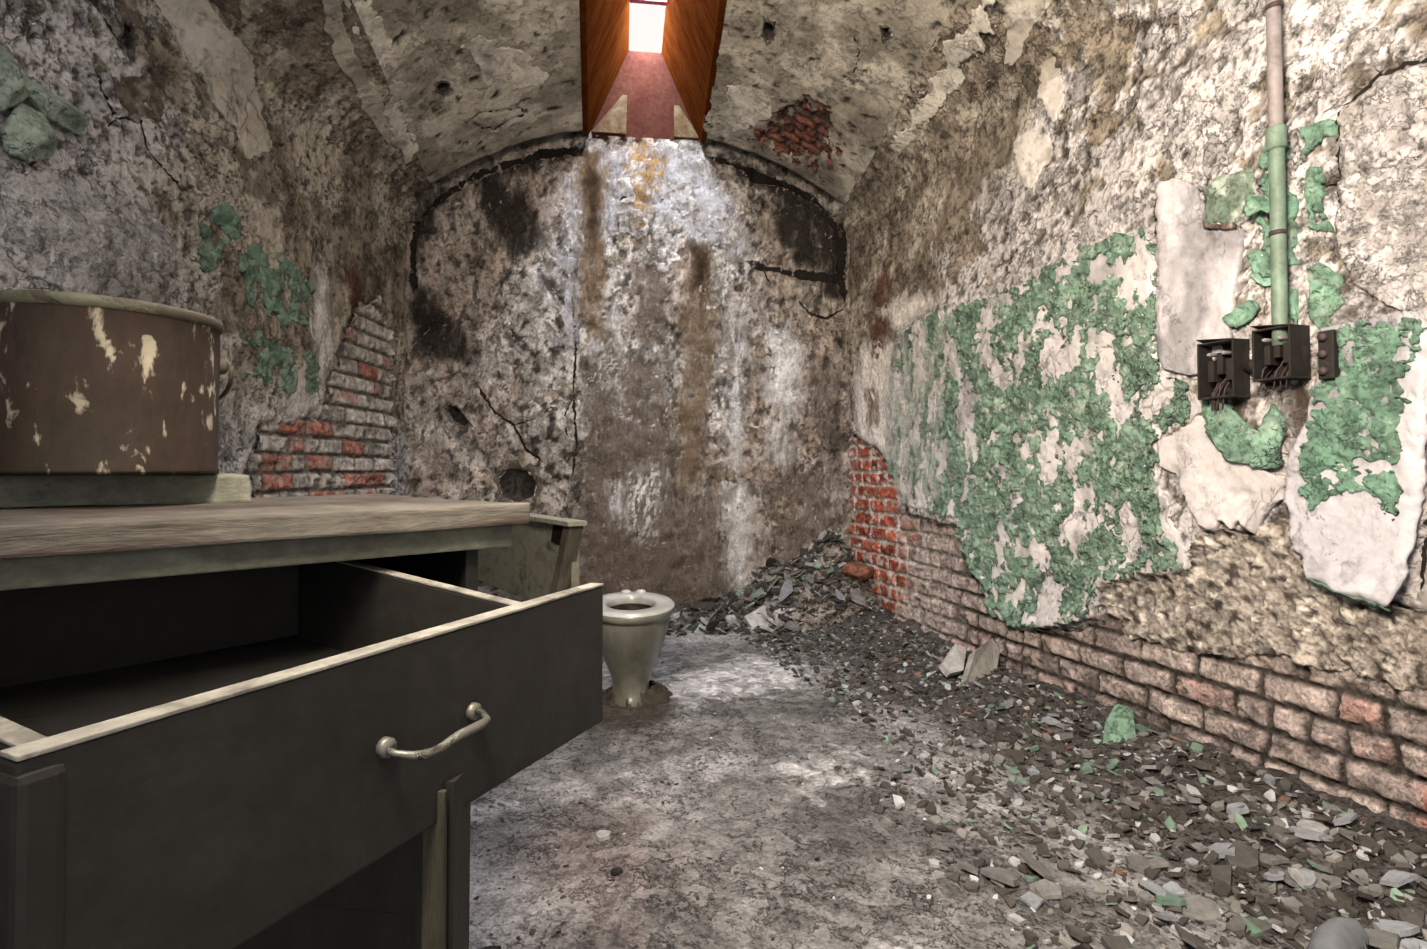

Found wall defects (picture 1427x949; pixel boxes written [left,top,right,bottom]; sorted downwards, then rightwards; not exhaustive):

peeling [0,45,90,162]
water stain [409,189,442,252]
water stain [476,145,750,344]
water stain [726,159,845,298]
flaking render [744,93,846,172]
crack [1326,58,1427,244]
flaking render [197,204,399,497]
water stain [410,287,469,364]
water stain [577,237,937,605]
peeling [848,63,1427,828]
crack [1419,512,1427,590]